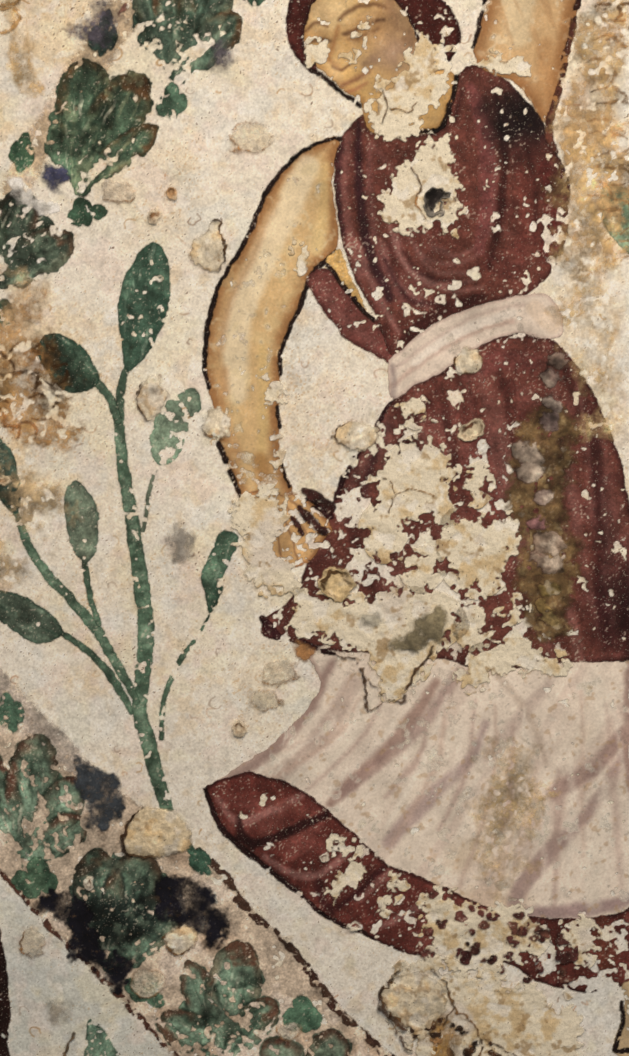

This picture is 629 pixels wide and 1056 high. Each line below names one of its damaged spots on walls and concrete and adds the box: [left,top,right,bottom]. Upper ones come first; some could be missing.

peeling [304,17,371,68]
spalling [470,48,531,77]
spalling [364,28,467,239]
peeling [288,240,309,276]
peeling [261,373,288,405]
leakage [505,353,590,641]
spalling [228,397,573,702]
peeling [319,834,366,903]
spalling [347,921,362,932]
spalling [377,871,602,1056]